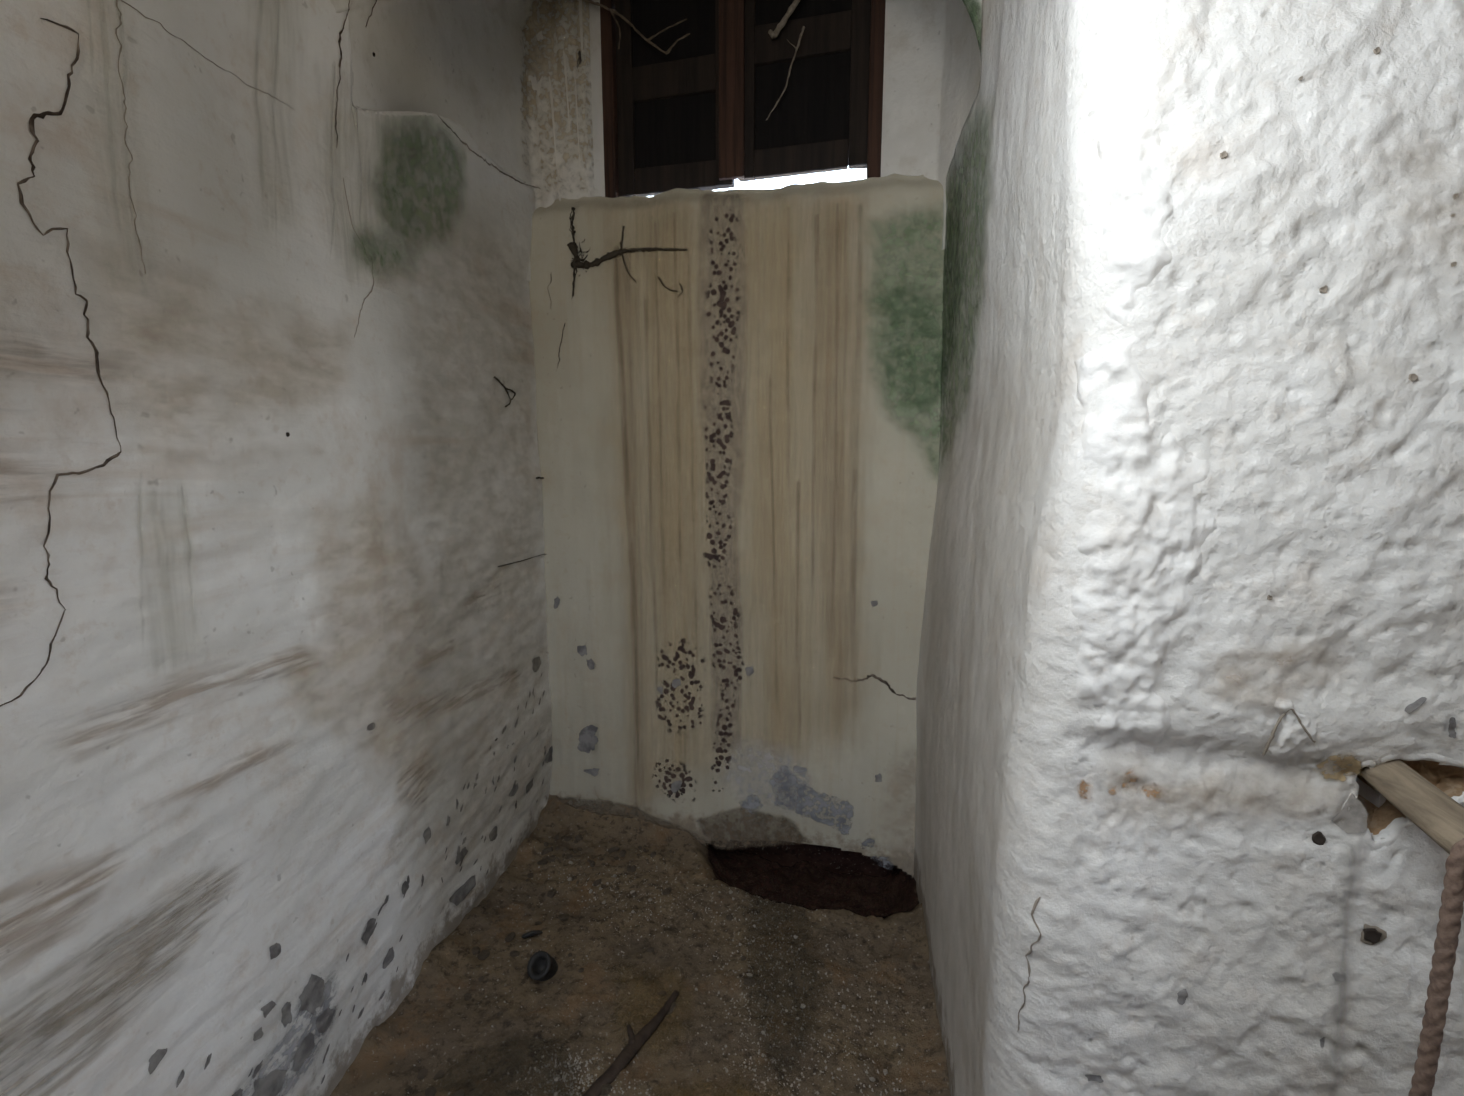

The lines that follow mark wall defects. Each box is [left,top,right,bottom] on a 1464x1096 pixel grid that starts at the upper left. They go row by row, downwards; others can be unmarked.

crack [115,0,294,274]
crack [335,0,377,337]
crack [0,18,122,707]
damp [656,214,744,792]
spalling [361,657,553,945]
damp [652,759,696,801]
spalling [1262,697,1464,850]
spalling [148,1048,167,1074]
spalling [232,935,403,1096]
spalling [1085,1074,1103,1083]
spalling [1177,989,1188,1005]